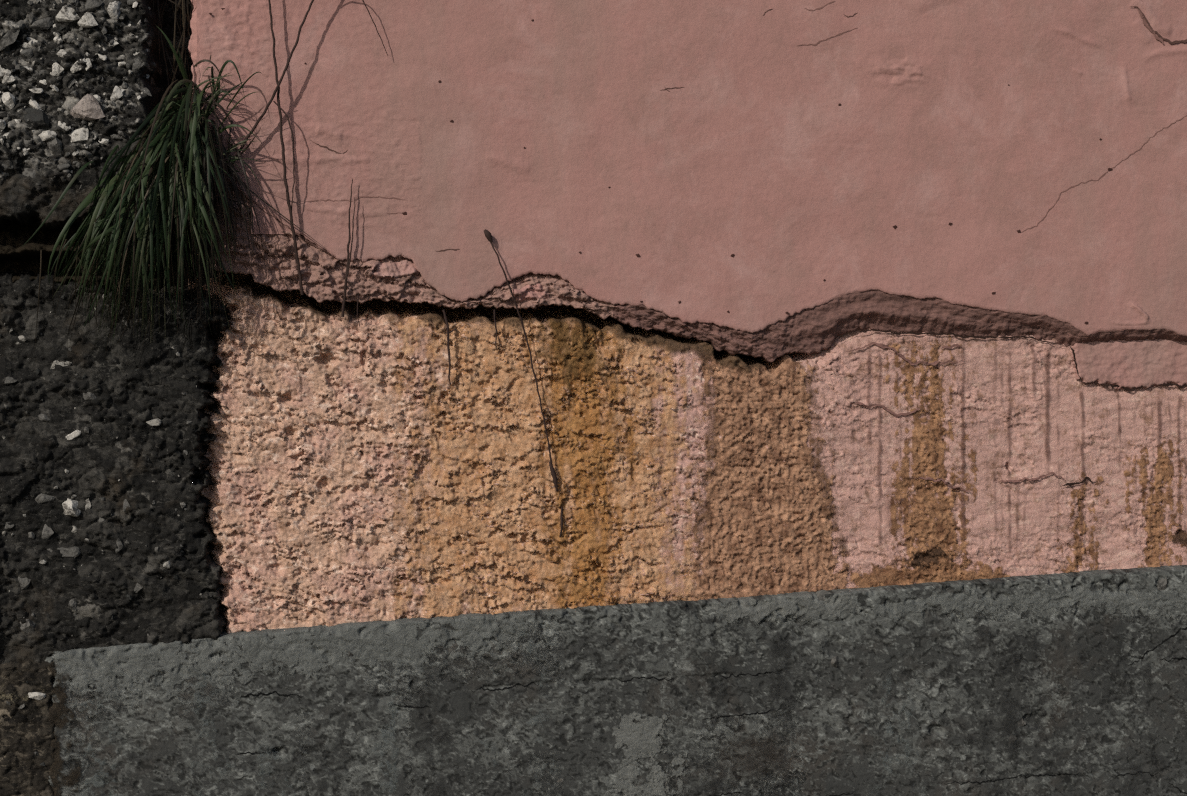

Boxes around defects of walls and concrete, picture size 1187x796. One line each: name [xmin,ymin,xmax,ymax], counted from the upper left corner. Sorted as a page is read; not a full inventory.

crack [1022,115,1187,232]
damp [867,354,881,493]
damp [1032,352,1058,459]
damp [1157,397,1181,436]